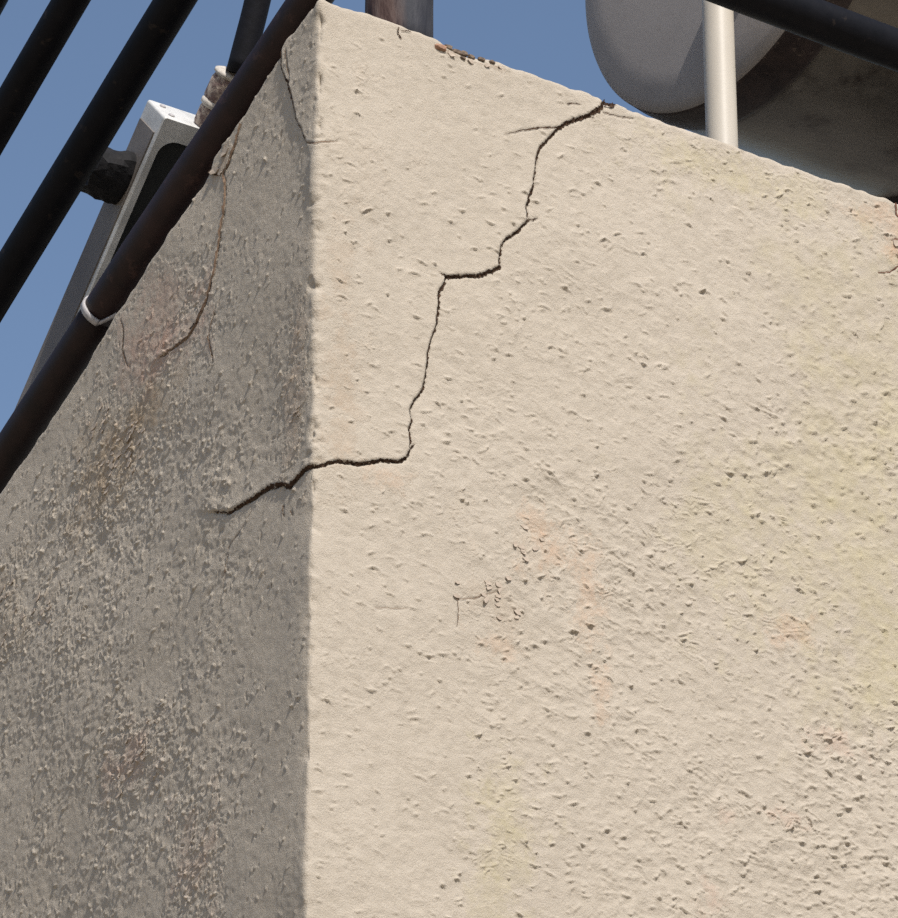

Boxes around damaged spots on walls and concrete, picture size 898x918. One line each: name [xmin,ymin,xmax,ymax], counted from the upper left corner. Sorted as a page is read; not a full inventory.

crack [280,51,338,144]
crack [160,123,241,362]
crack [214,99,633,596]